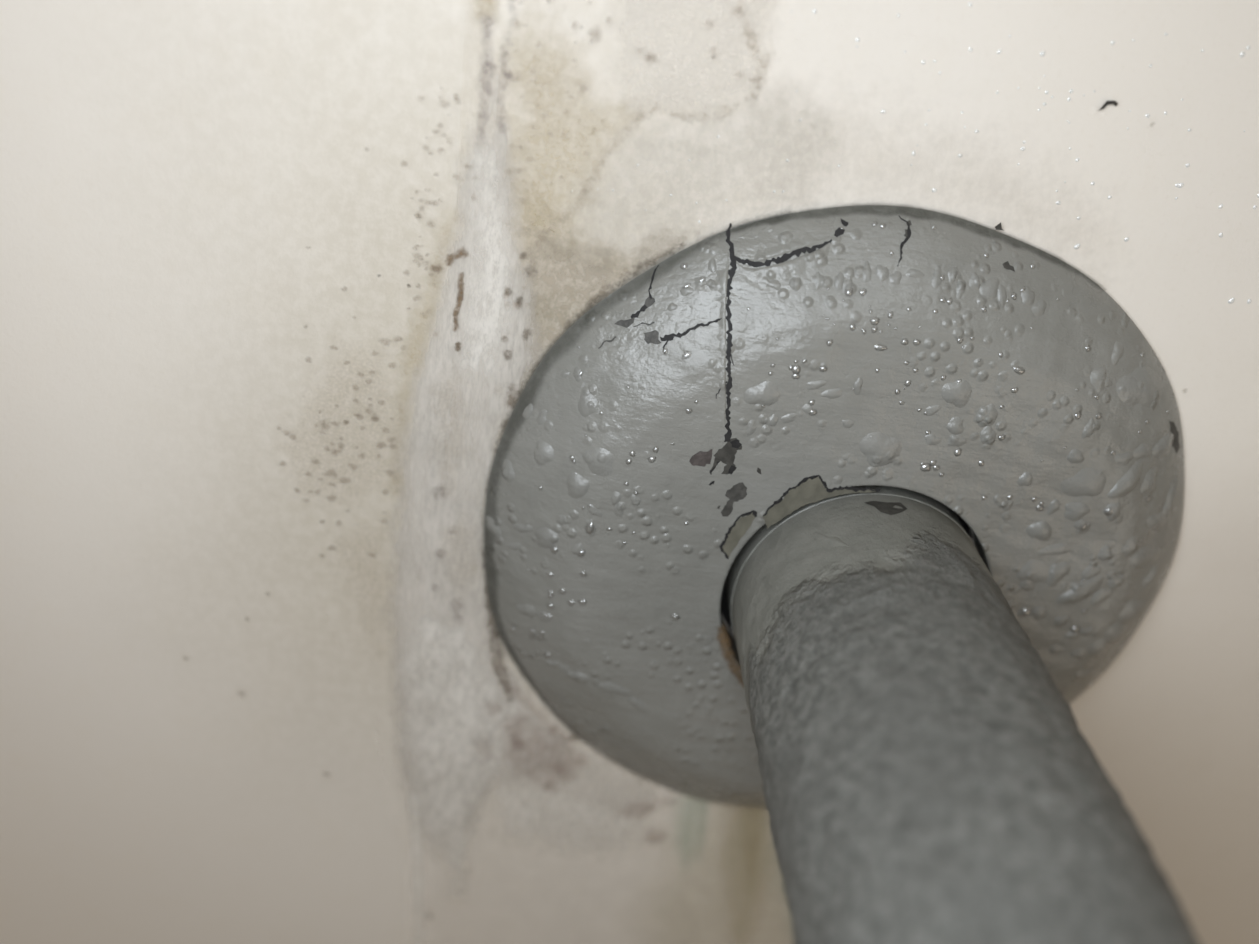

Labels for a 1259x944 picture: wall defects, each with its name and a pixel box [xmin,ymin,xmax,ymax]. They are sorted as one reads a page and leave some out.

crack [897,216,912,266]
crack [599,219,849,442]
peeling [689,438,907,559]